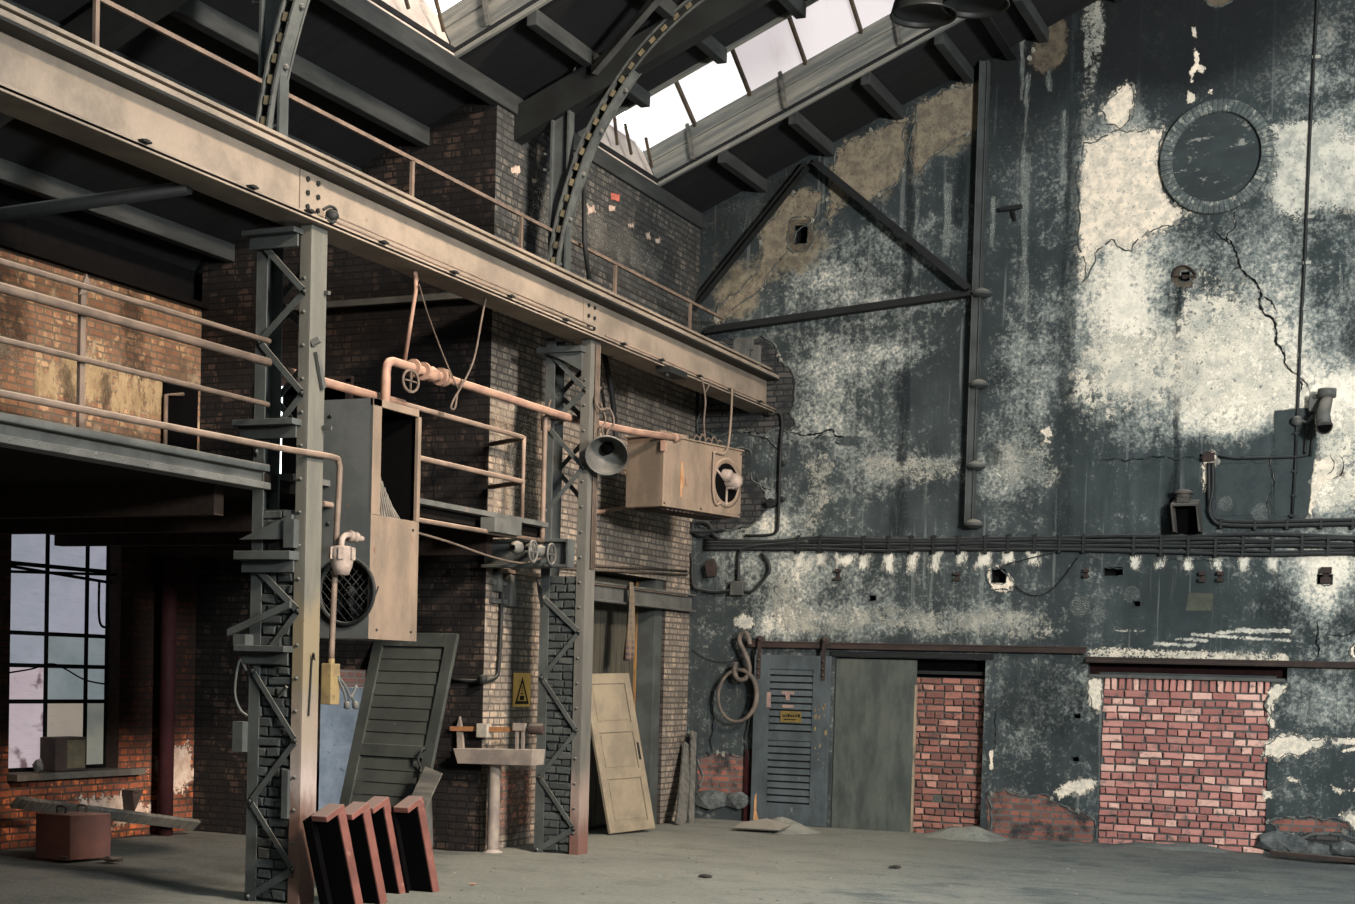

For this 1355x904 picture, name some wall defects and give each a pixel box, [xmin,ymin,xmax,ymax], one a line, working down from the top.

peeling [1186,27,1213,104]
peeling [1027,1,1192,285]
peeling [713,79,991,325]
crack [1216,211,1310,391]
flaking render [695,335,798,539]
peeling [863,452,960,485]
spalling [1103,556,1140,578]
peeling [1088,627,1291,661]
peeling [1260,682,1355,762]
flaking render [986,755,1098,843]
flaking render [1265,810,1355,858]